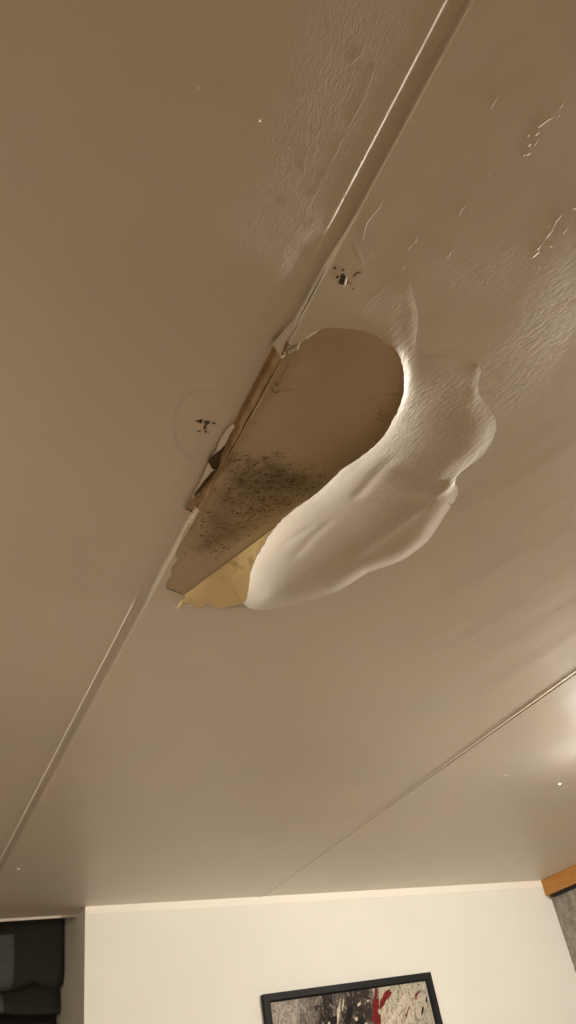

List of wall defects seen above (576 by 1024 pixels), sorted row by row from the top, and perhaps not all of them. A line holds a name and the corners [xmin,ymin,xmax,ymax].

water stain [184,451,330,561]
peeling [166,275,496,610]